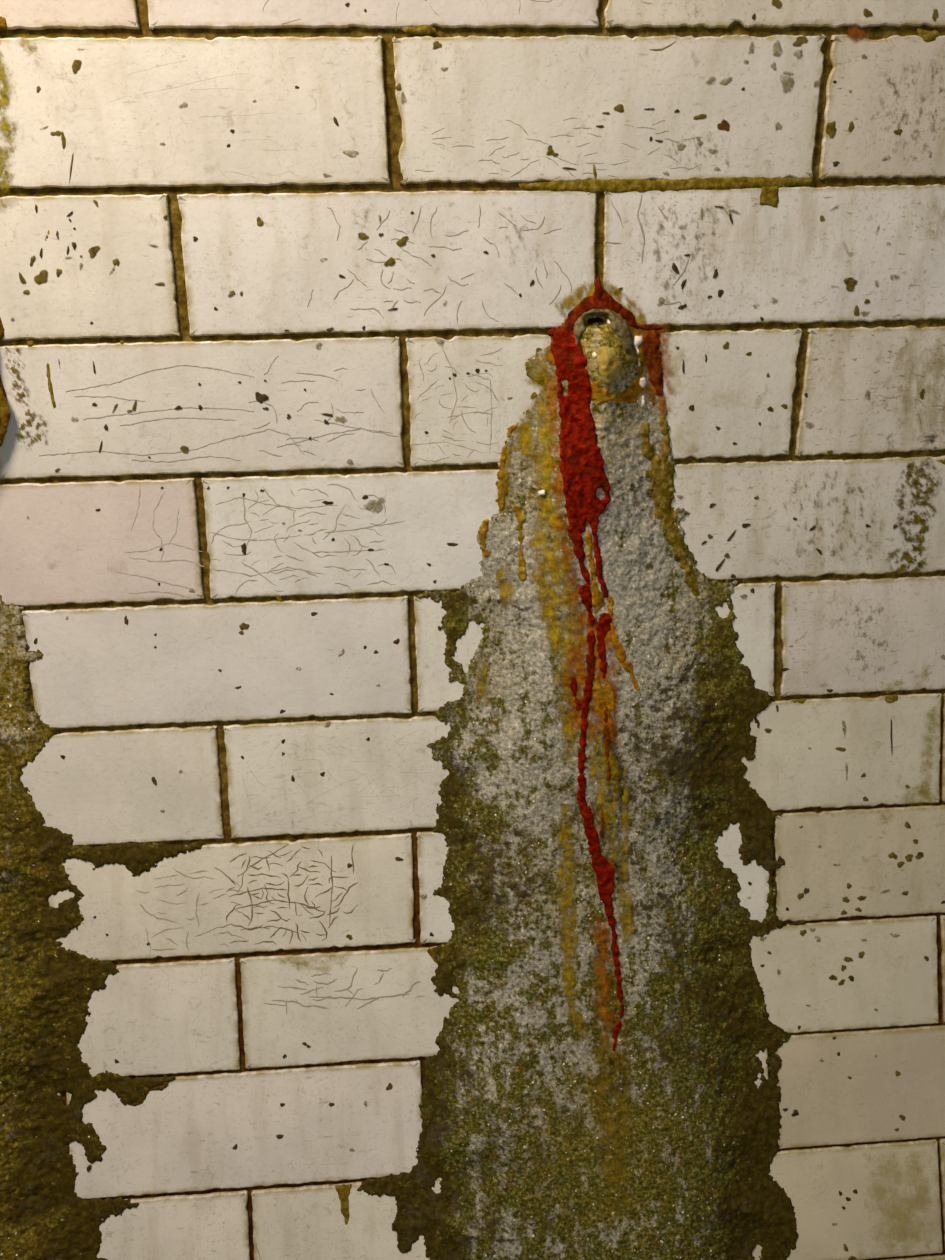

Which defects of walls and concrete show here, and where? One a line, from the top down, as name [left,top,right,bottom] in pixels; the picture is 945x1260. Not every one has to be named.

water stain [0,595,205,1260]
peeling [362,495,385,513]
water stain [357,316,805,1260]
rust [477,276,704,1206]
spalling [702,523,751,578]